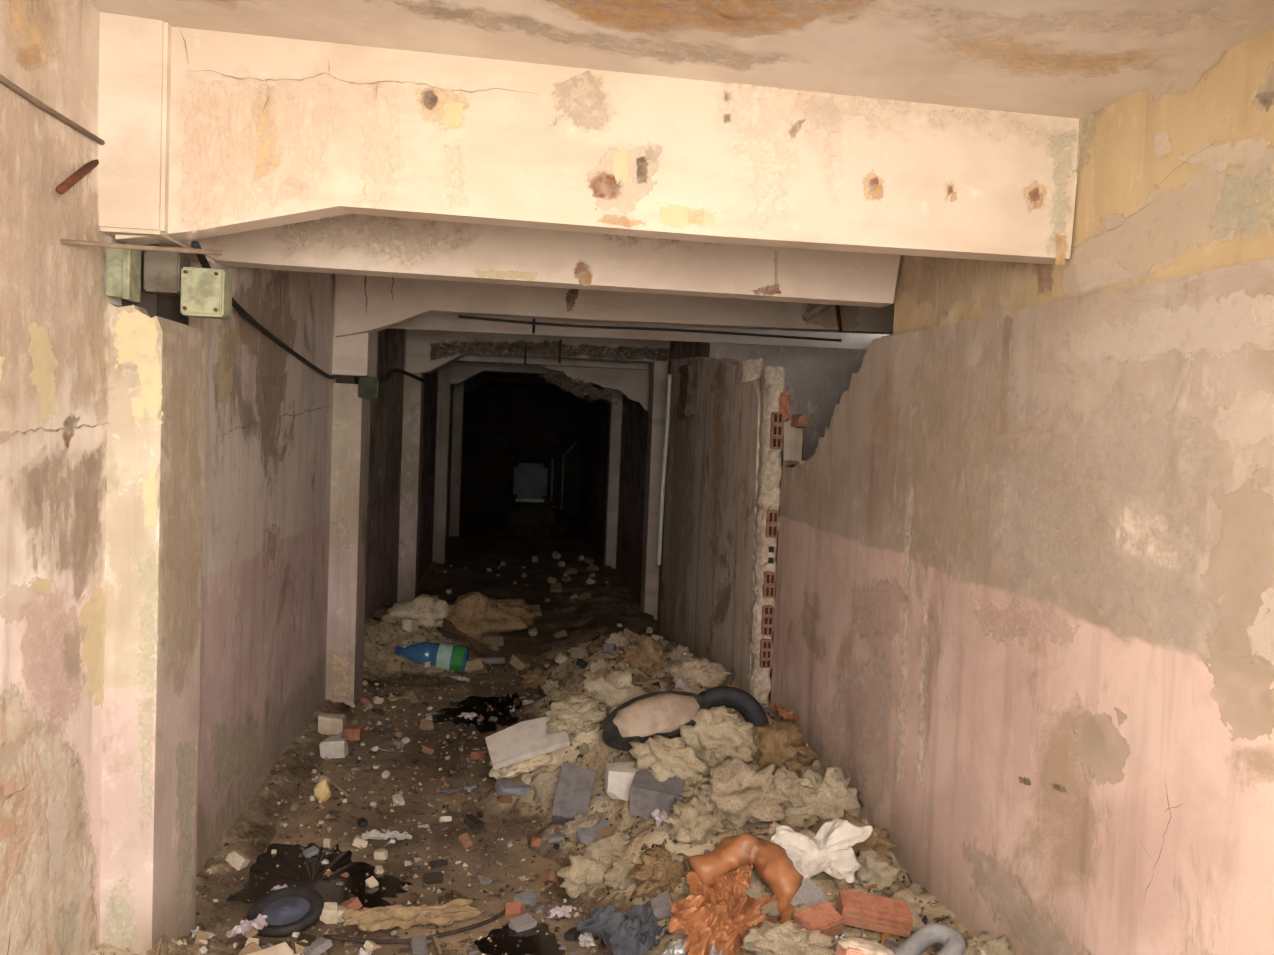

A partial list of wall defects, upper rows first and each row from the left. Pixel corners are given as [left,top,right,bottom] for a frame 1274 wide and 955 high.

peeling [1251,62,1274,110]
spalling [588,145,662,228]
peeling [660,204,716,229]
corrosion [864,172,883,199]
crack [10,423,106,437]
peeling [1209,388,1274,450]
damp [896,487,928,786]
peeling [1200,468,1274,741]
spalling [0,577,106,955]
peeling [1073,707,1131,786]